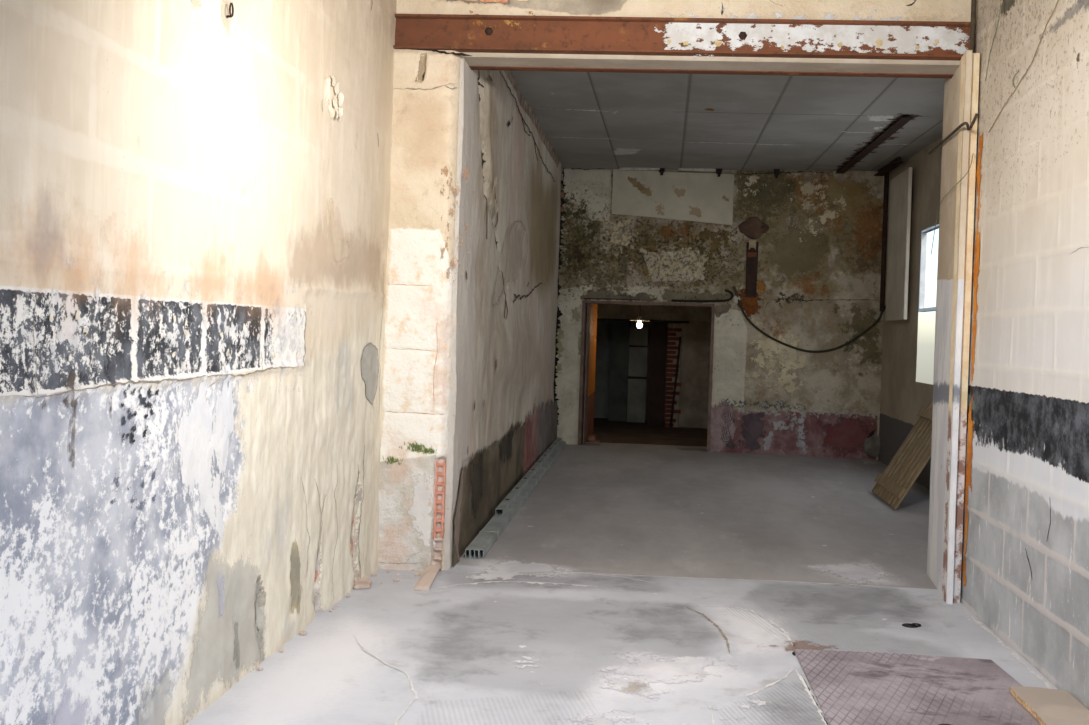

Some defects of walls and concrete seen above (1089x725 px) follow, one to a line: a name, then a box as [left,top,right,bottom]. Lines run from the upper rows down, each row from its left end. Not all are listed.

peeling [654,7,976,60]
crack [395,49,613,425]
peeling [595,217,708,285]
peeling [736,175,767,199]
peeling [787,171,847,243]
peeling [14,277,111,414]
crack [379,278,438,415]
flaking render [556,288,657,373]
corrosion [737,281,765,319]
peeling [136,279,312,553]
water stain [707,402,766,452]
water stain [453,399,557,568]